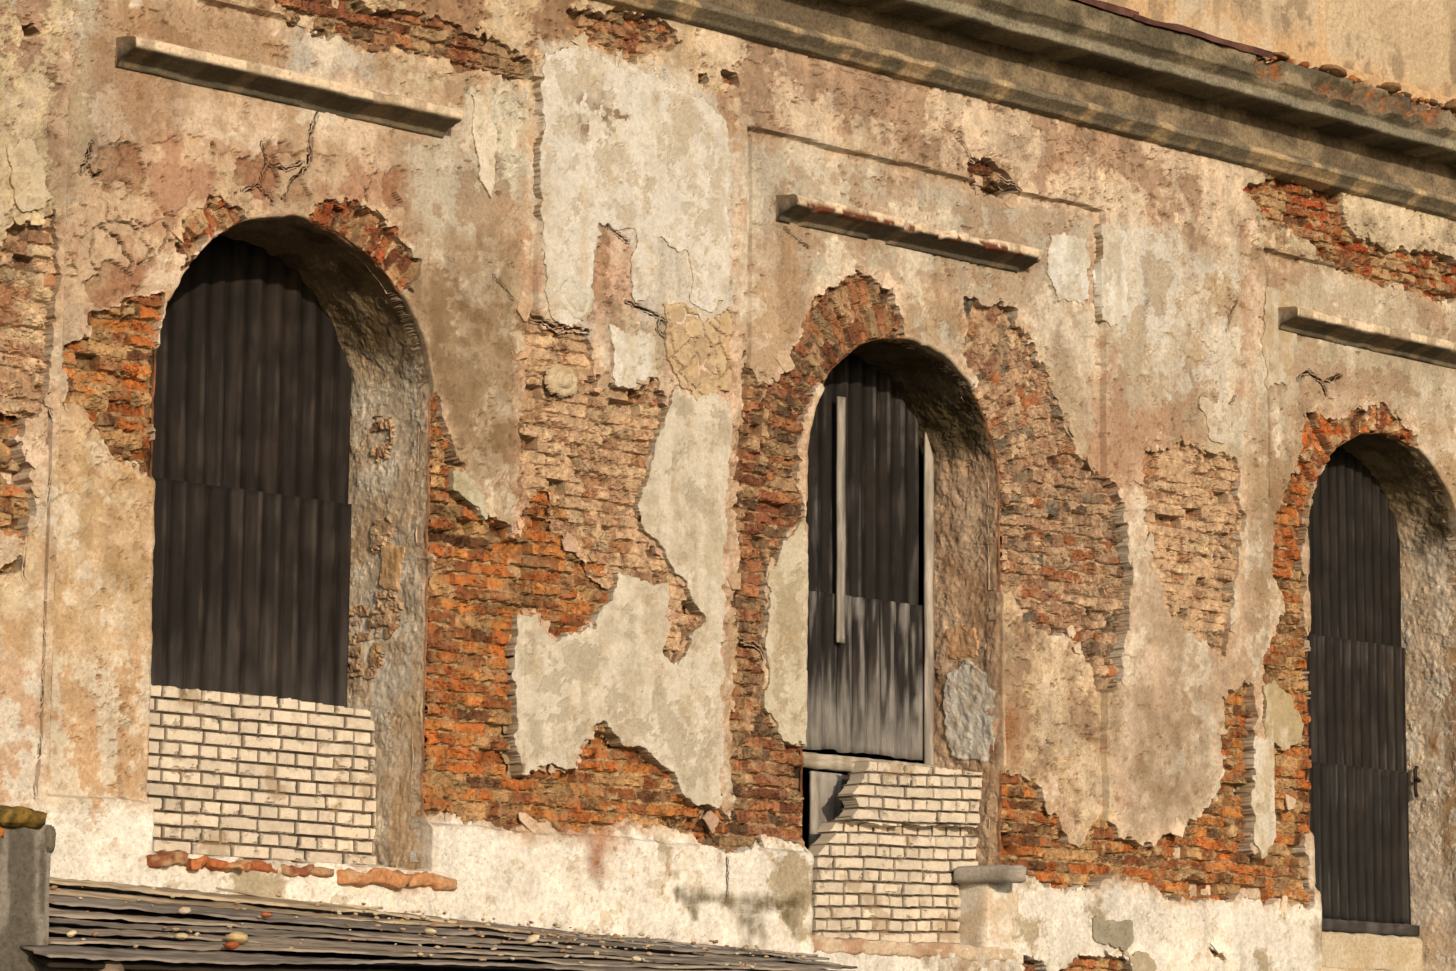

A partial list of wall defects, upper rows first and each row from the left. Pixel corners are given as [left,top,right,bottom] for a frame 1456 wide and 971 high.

spalling [0,139,163,541]
spalling [168,187,240,271]
flaking render [274,0,902,859]
flaking render [943,624,996,763]
spalling [963,299,1243,693]
spalling [990,403,1417,914]
spalling [1243,179,1456,301]
flaking render [1022,915,1157,971]